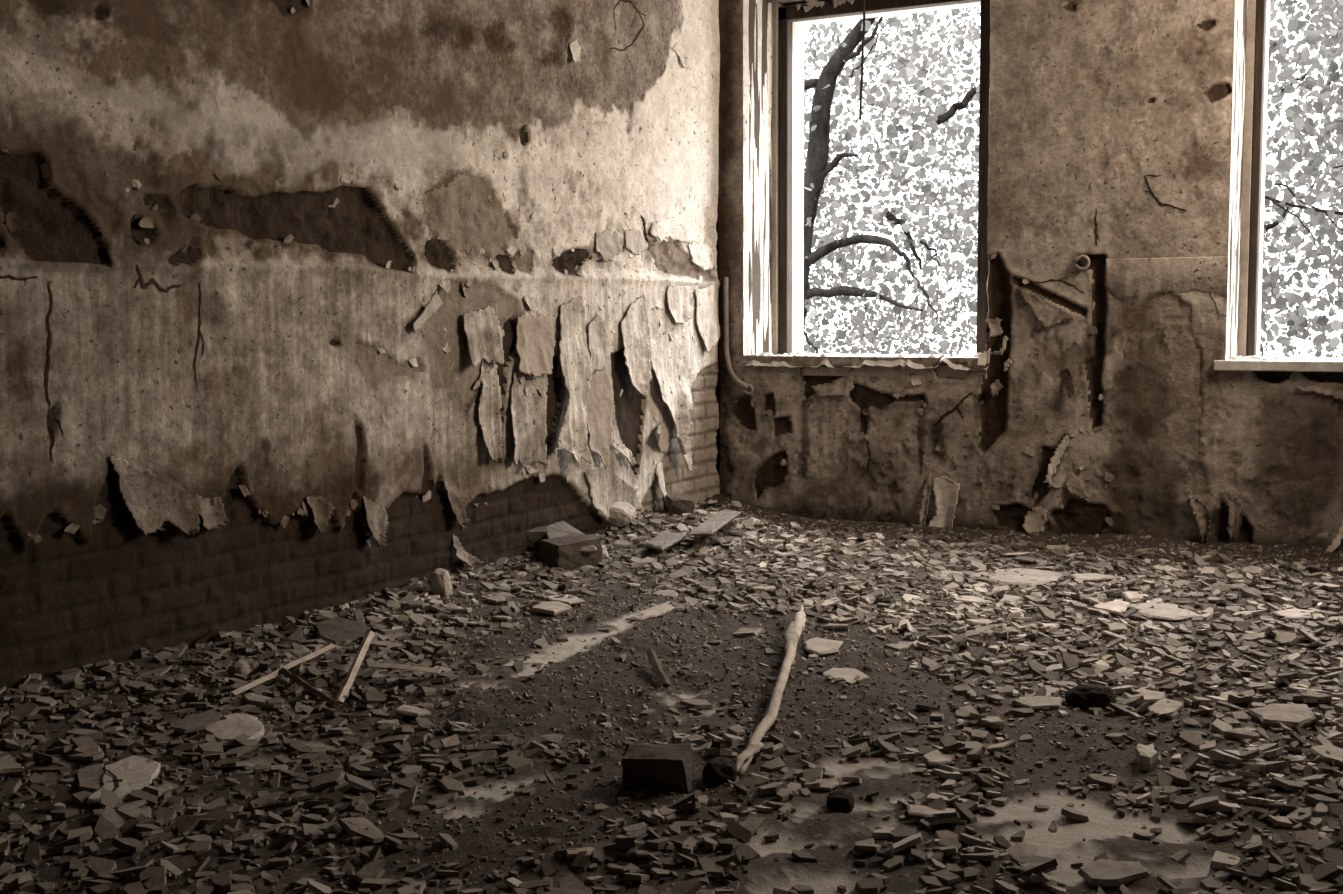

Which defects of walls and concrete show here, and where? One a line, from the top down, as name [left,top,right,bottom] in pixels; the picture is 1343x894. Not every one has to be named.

damp [30,0,683,141]
spalling [0,148,112,267]
flaking render [0,169,953,689]
spalling [935,254,1115,535]
flaking render [1253,371,1343,401]
flaking render [918,475,960,530]
flaking render [1326,520,1343,552]